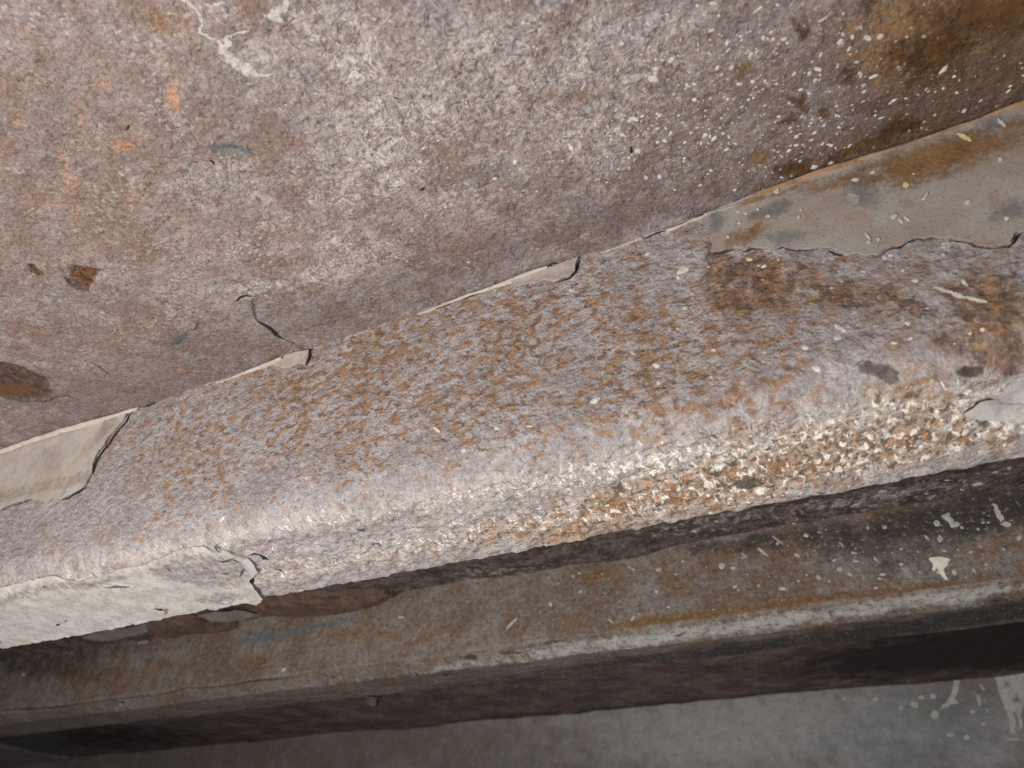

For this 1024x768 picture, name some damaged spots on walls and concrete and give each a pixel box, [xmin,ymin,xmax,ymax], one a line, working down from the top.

peeling [600,100,1024,253]
peeling [418,257,581,315]
crack [236,295,305,350]
rust [854,361,928,391]
rust [955,366,983,378]
peeling [0,402,157,511]
spalling [733,478,765,489]
rust [245,588,394,617]
peeling [82,623,149,644]